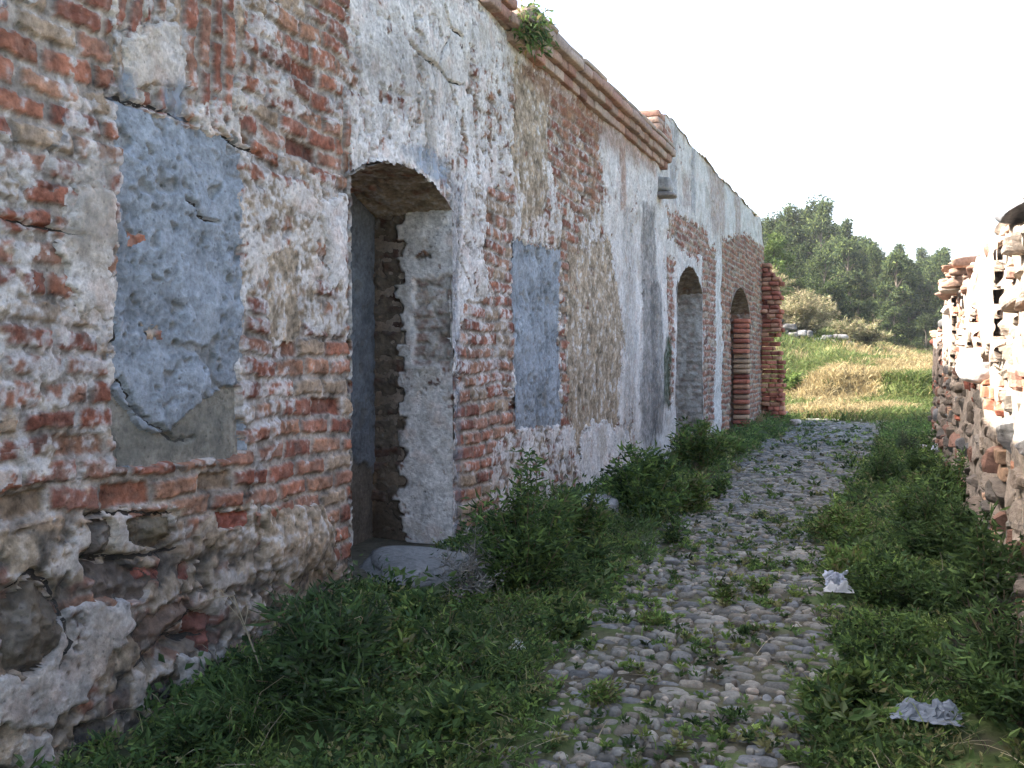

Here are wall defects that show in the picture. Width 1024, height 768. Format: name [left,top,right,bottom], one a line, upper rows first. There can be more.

crack [105,96,189,123]
spalling [0,0,354,177]
crack [221,136,252,154]
crack [0,217,78,235]
spalling [453,50,631,536]
spalling [665,204,764,433]
crack [5,568,74,656]
flaking render [0,597,136,768]
spalling [173,608,211,692]